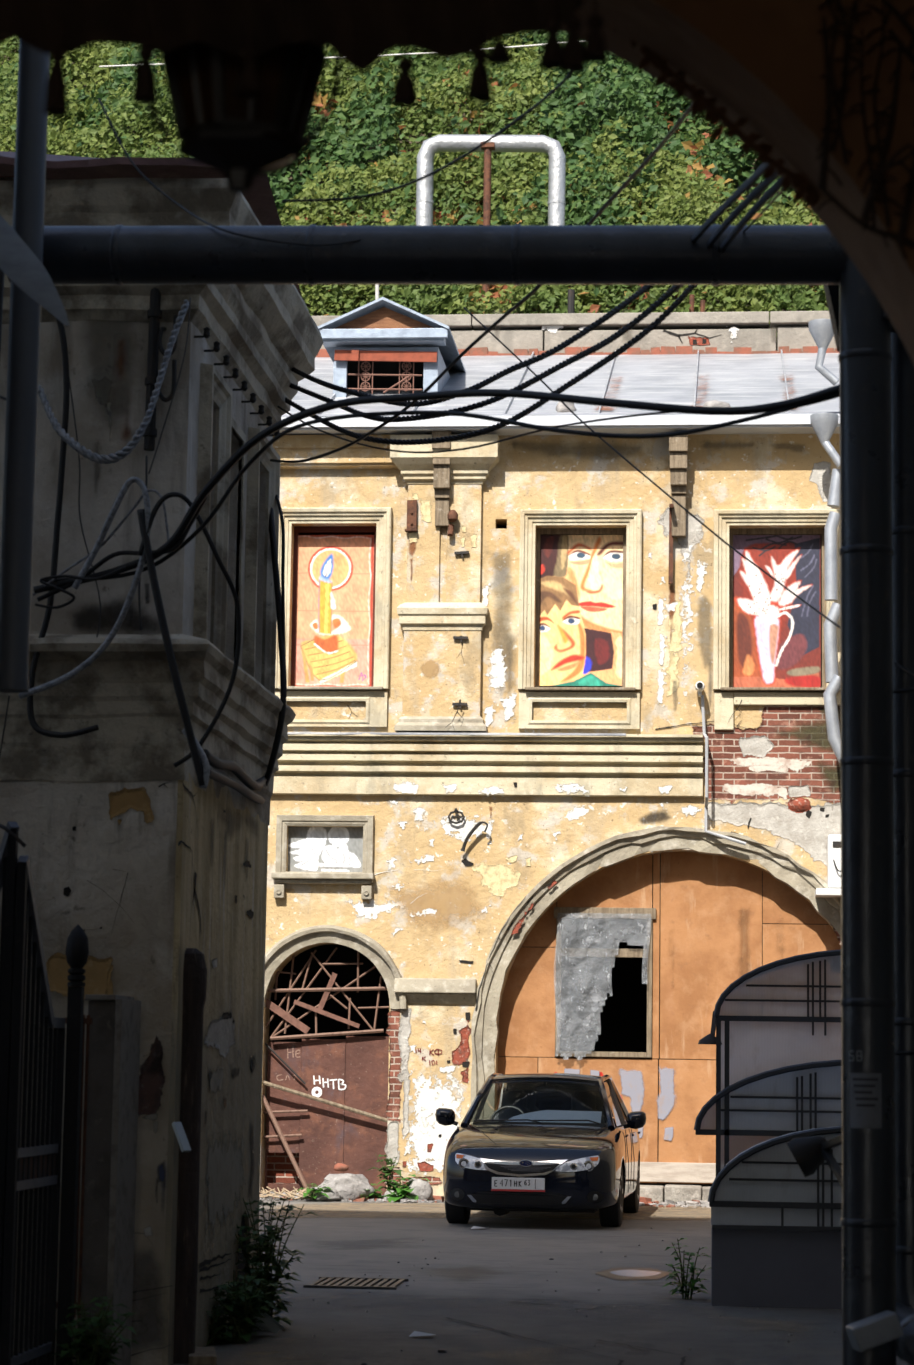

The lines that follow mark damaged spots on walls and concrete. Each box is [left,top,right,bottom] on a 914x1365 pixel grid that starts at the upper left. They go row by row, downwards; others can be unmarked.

peeling [482,583,491,606]
peeling [653,507,708,707]
peeling [484,645,517,727]
peeling [108,787,154,825]
peeling [478,782,517,797]
peeling [553,780,589,840]
flaking render [658,705,841,866]
spalling [138,1036,165,1133]
peeling [384,1008,471,1185]